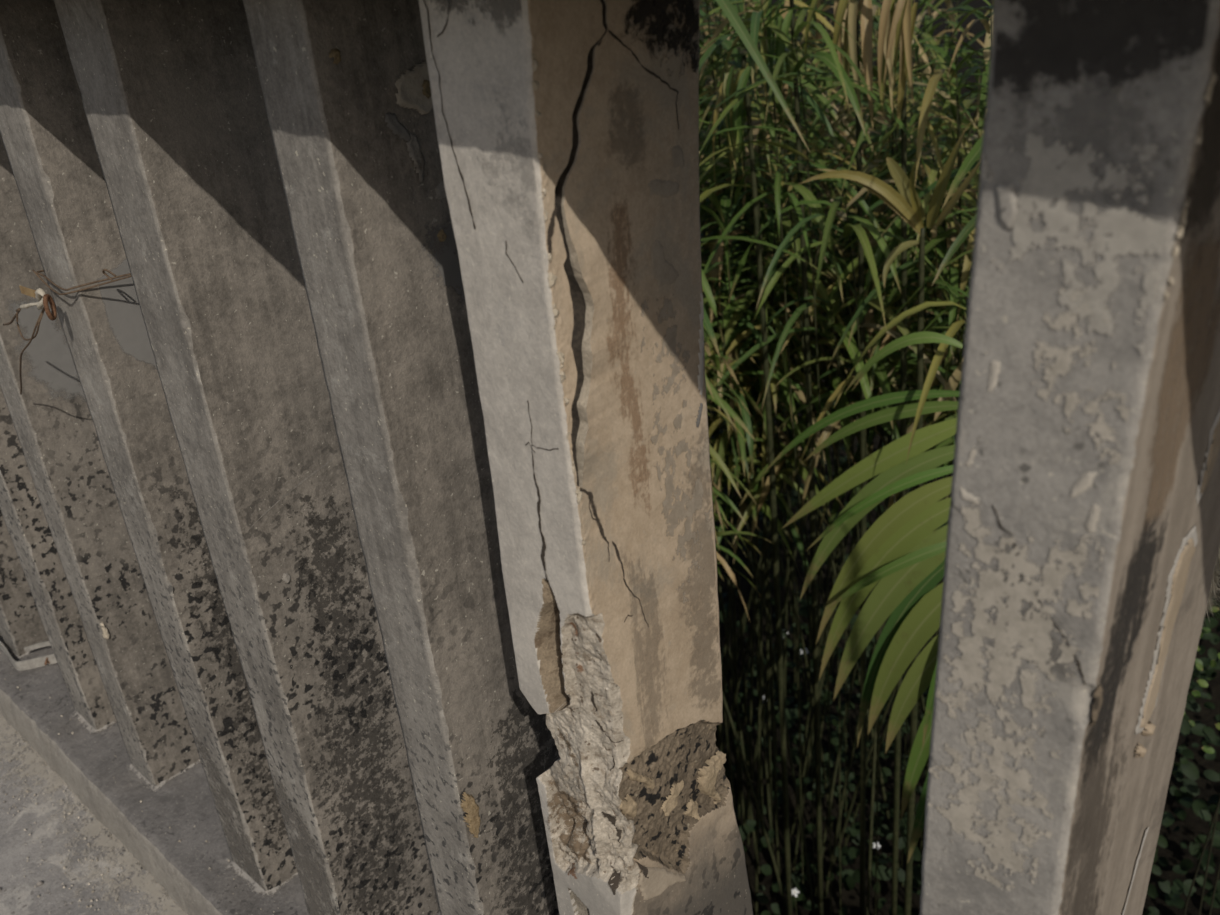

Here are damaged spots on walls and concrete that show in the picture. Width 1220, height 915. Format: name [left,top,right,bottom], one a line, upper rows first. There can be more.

flaking render [395,61,433,115]
peeling [435,180,446,200]
crack [423,0,476,229]
crack [525,0,679,627]
peeling [928,130,1190,891]
spalling [534,579,730,915]